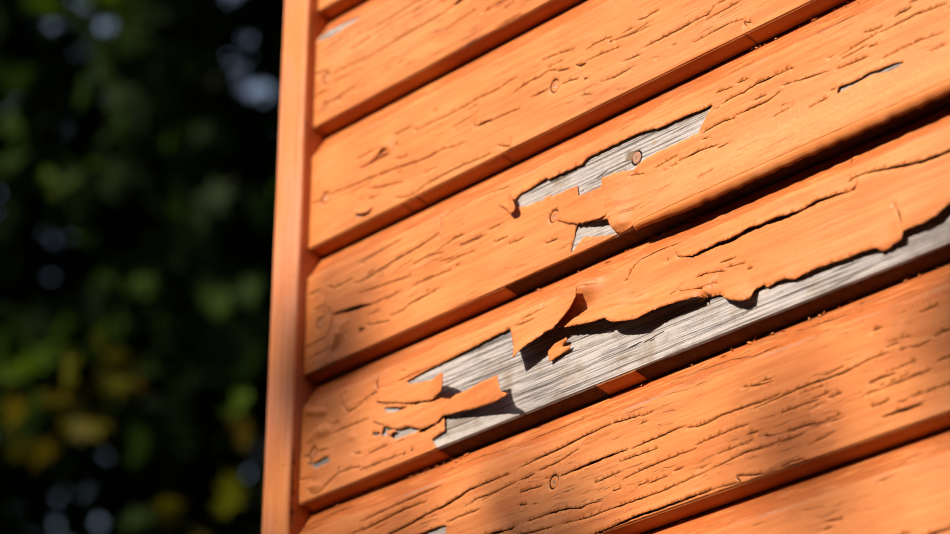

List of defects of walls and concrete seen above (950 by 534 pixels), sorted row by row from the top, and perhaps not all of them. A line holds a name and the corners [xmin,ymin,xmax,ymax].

crack [317,0,469,103]
crack [398,9,749,134]
crack [689,0,940,157]
crack [313,146,510,204]
crack [310,224,523,342]
peeling [372,217,950,449]
peeling [498,80,950,248]
crack [634,148,950,291]
crack [304,328,950,534]
peeling [422,525,447,534]